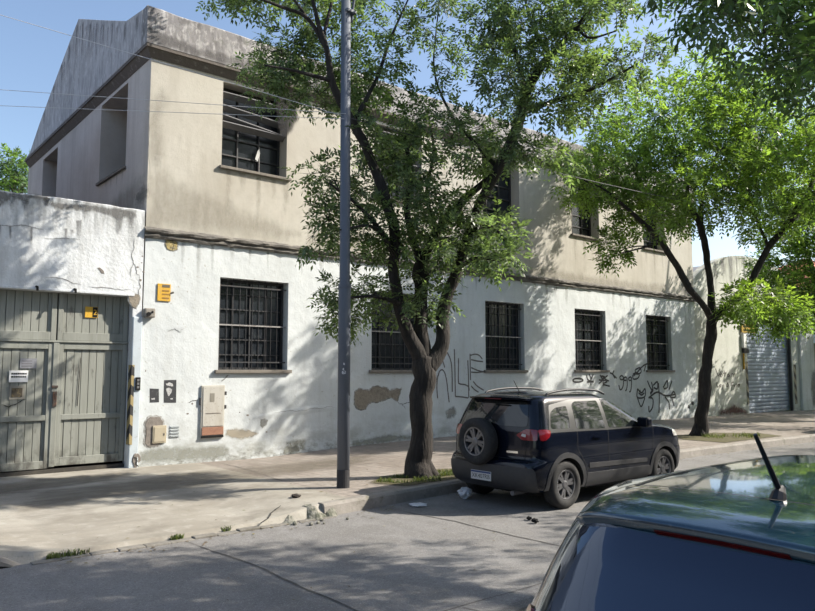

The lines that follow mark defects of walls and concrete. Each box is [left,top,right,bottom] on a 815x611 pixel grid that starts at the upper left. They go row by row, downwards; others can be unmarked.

damp [0,191,136,229]
spalling [164,240,178,252]
crack [46,241,141,306]
spalling [354,385,402,411]